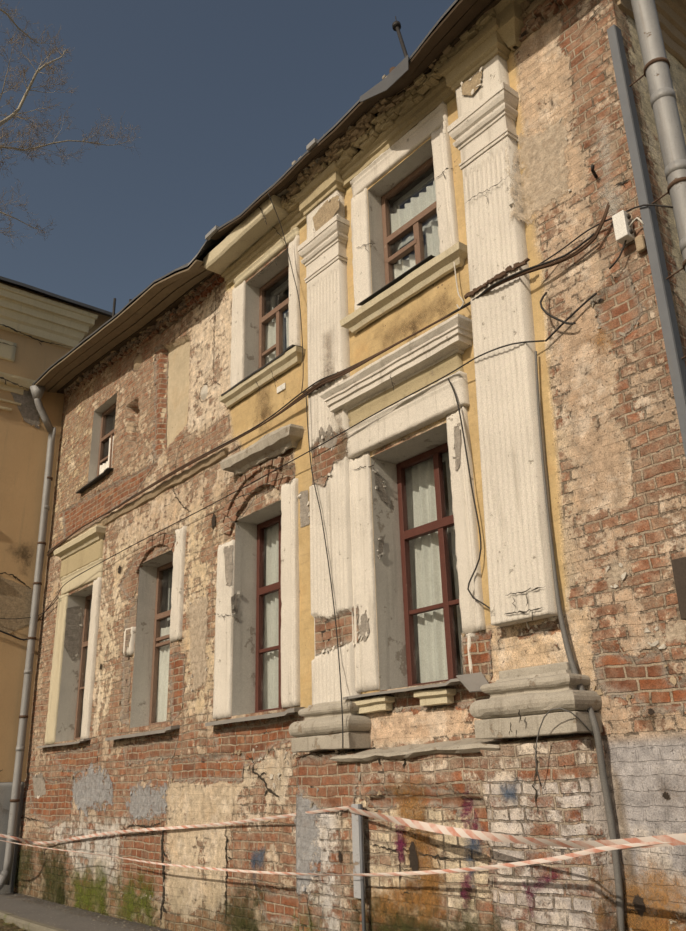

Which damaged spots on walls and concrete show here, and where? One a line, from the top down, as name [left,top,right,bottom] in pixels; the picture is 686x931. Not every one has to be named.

spalling [519,0,572,42]
peeling [504,117,571,224]
spalling [590,270,644,343]
spalling [62,273,225,540]
spalling [298,425,348,528]
peeling [451,423,461,471]
peeling [604,556,632,591]
spalling [315,605,370,655]
spalling [25,744,114,827]
spalling [119,716,297,901]
crack [247,756,280,801]
crack [120,821,167,925]